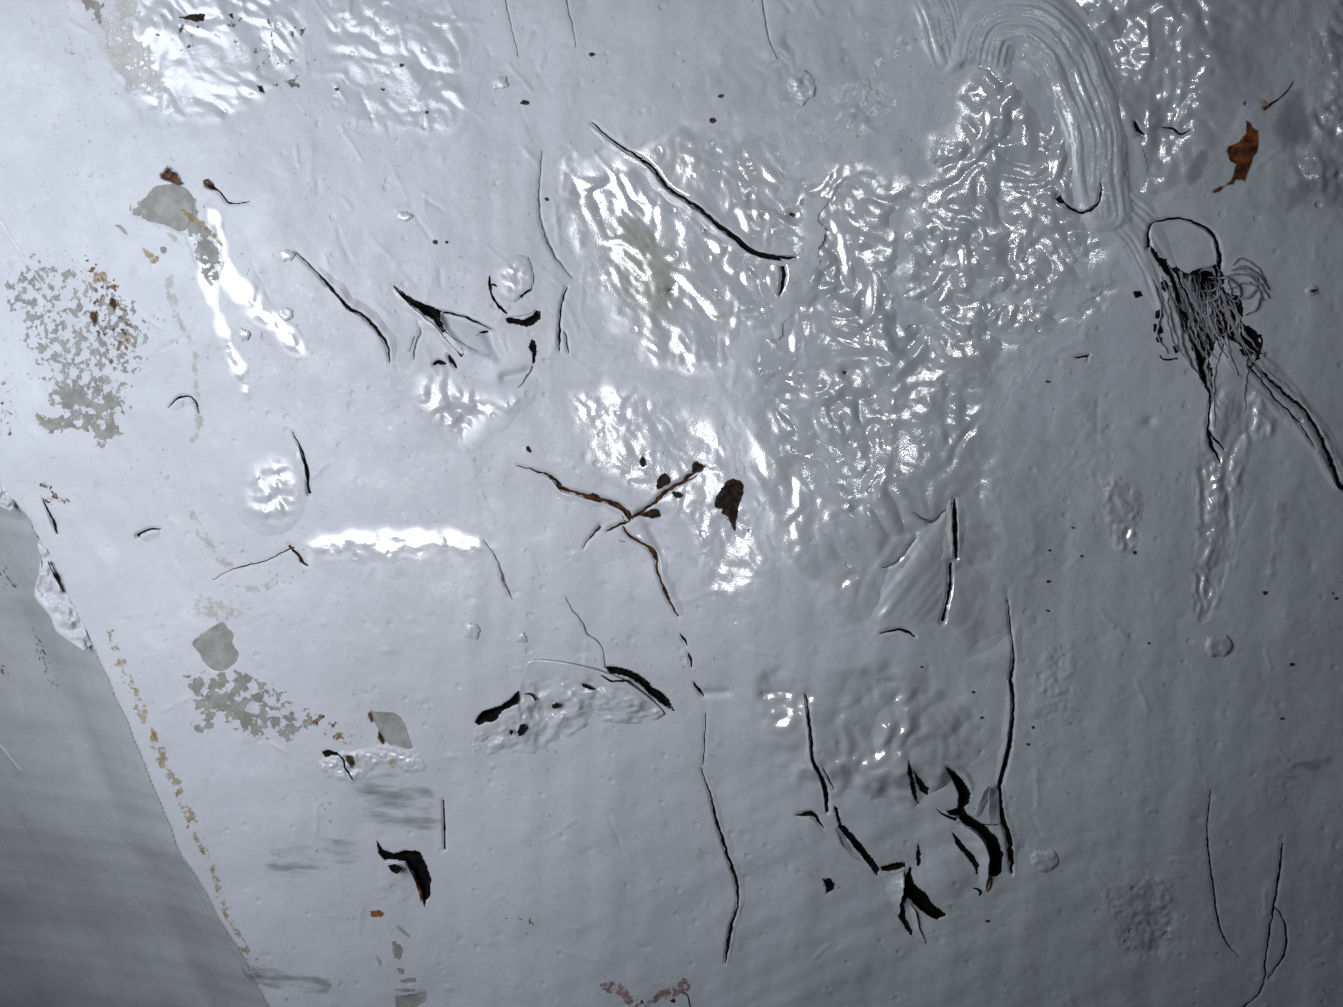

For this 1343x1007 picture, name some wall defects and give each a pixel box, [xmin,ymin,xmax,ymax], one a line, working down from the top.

peeling [81,0,104,25]
crack [589,122,797,295]
crack [1146,217,1222,265]
corrosion [1213,121,1258,193]
peeling [5,253,149,448]
crack [1160,335,1343,496]
peeling [183,623,427,784]
crack [517,465,746,965]
crack [796,694,834,828]
crack [936,599,1020,874]